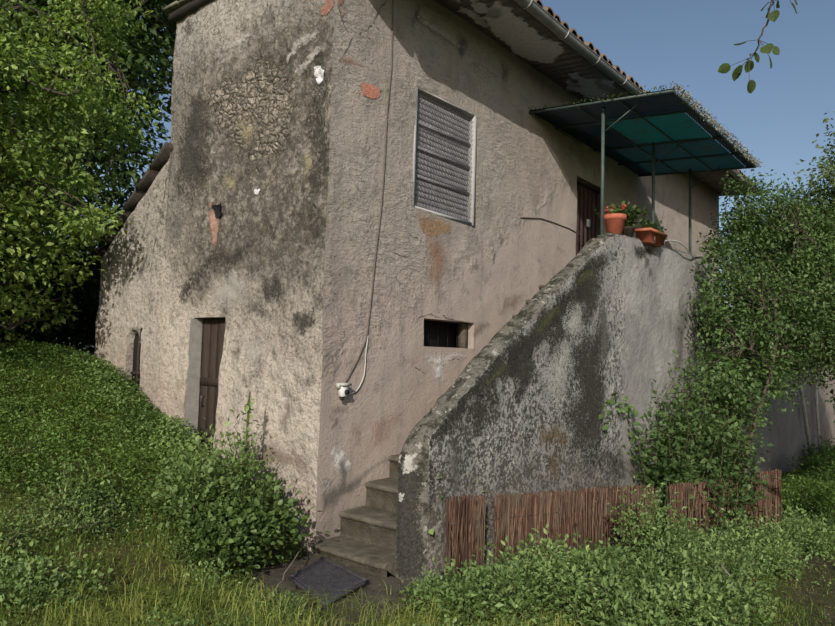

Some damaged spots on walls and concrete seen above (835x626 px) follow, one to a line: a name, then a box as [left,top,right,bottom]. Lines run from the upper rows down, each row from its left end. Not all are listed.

peeling [457,0,565,64]
flaking render [207,31,324,170]
flaking render [357,83,380,98]
damp [177,91,211,210]
damp [305,51,329,238]
flaking render [209,202,221,244]
damp [179,244,250,303]
damp [262,279,285,302]
damp [293,307,315,338]
damp [428,253,613,483]
damp [396,452,437,581]